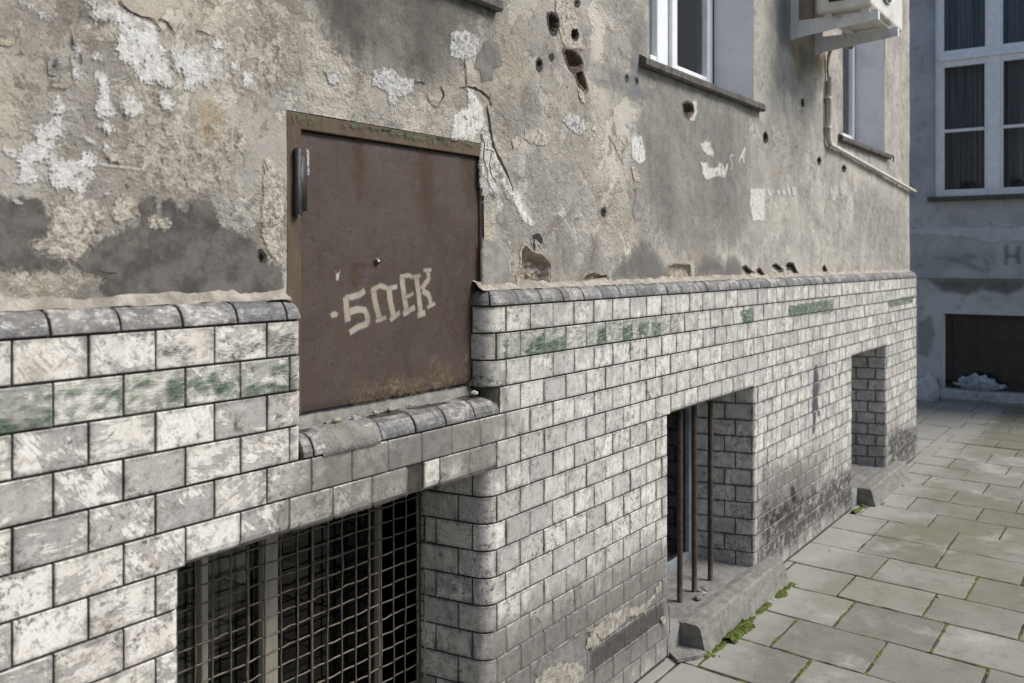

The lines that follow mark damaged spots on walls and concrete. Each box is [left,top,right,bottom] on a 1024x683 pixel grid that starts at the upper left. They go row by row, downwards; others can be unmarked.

flaking render [555,0,585,65]
flaking render [0,0,300,262]
flaking render [372,66,414,106]
crack [359,63,514,226]
flaking render [344,89,553,285]
flaking render [562,88,598,135]
flaking render [608,134,646,184]
flaking render [700,140,727,179]
flaking render [750,187,765,222]
leakage [0,193,284,298]
flaking render [742,262,799,275]
spalling [534,581,662,677]